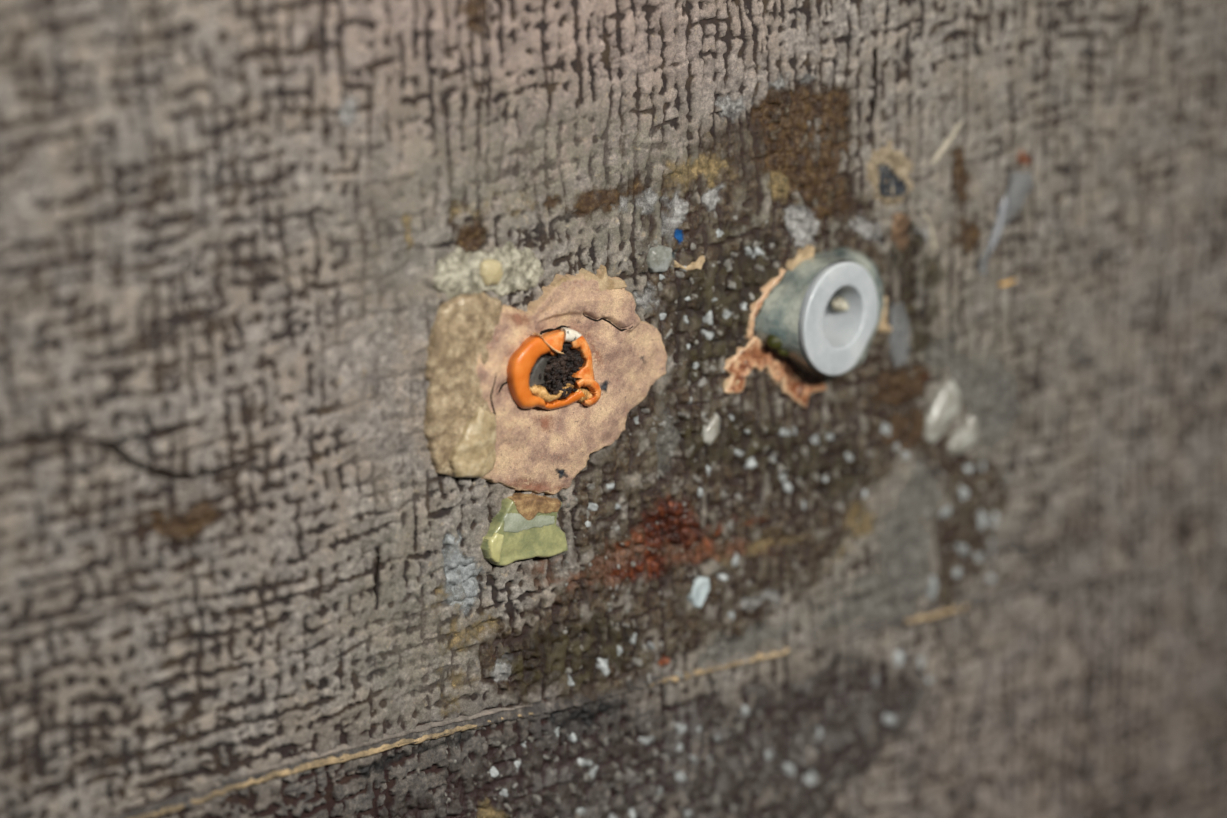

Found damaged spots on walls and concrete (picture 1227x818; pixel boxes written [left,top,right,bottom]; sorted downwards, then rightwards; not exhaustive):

peeling [723,268,827,407]
crack [0,417,254,480]
damp [358,74,1006,818]
corrosion [591,497,746,585]